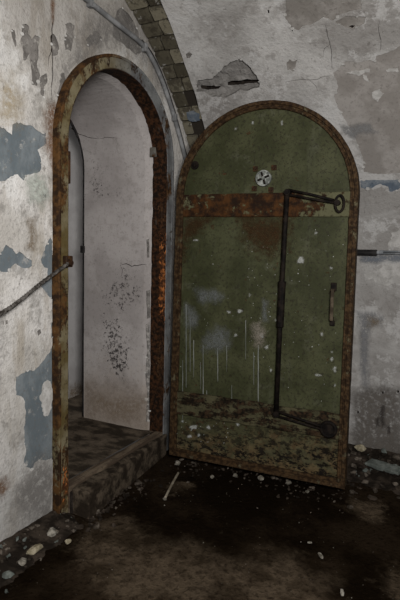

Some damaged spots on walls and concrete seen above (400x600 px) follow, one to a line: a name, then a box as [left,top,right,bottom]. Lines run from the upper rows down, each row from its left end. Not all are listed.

flaking render [11,24,48,99]
crack [47,7,55,95]
flaking render [50,23,76,57]
flaking render [195,58,261,98]
crack [288,26,332,91]
flaking render [283,0,366,31]
peeling [0,121,46,181]
flaking render [333,46,400,192]
peeling [0,245,32,272]
corrosion [158,233,166,322]
mould [100,313,127,376]
peeling [16,348,53,472]